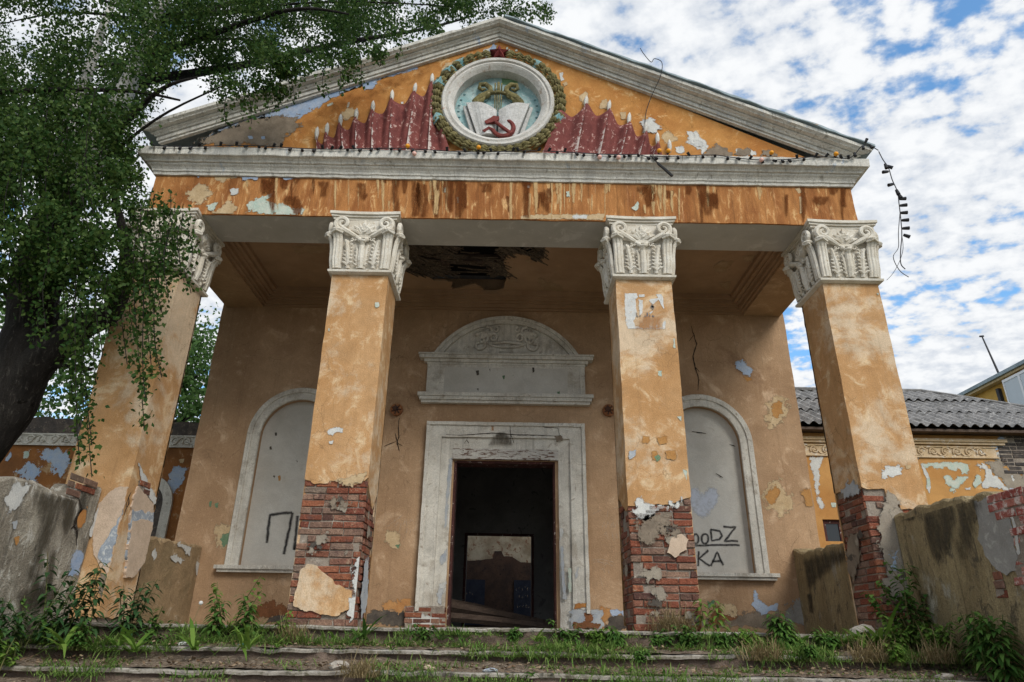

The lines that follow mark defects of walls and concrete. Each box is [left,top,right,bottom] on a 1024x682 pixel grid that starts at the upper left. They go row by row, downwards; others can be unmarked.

flaking render [194,67,418,148]
peeling [639,117,778,157]
peeling [185,176,305,215]
leakage [423,180,448,214]
leakage [528,182,610,218]
leakage [644,184,680,220]
crack [689,326,699,385]
peeling [4,447,99,546]
flaking render [138,463,157,504]
flaking render [266,471,447,628]
flaking render [560,496,804,632]
flaking render [760,427,1024,632]